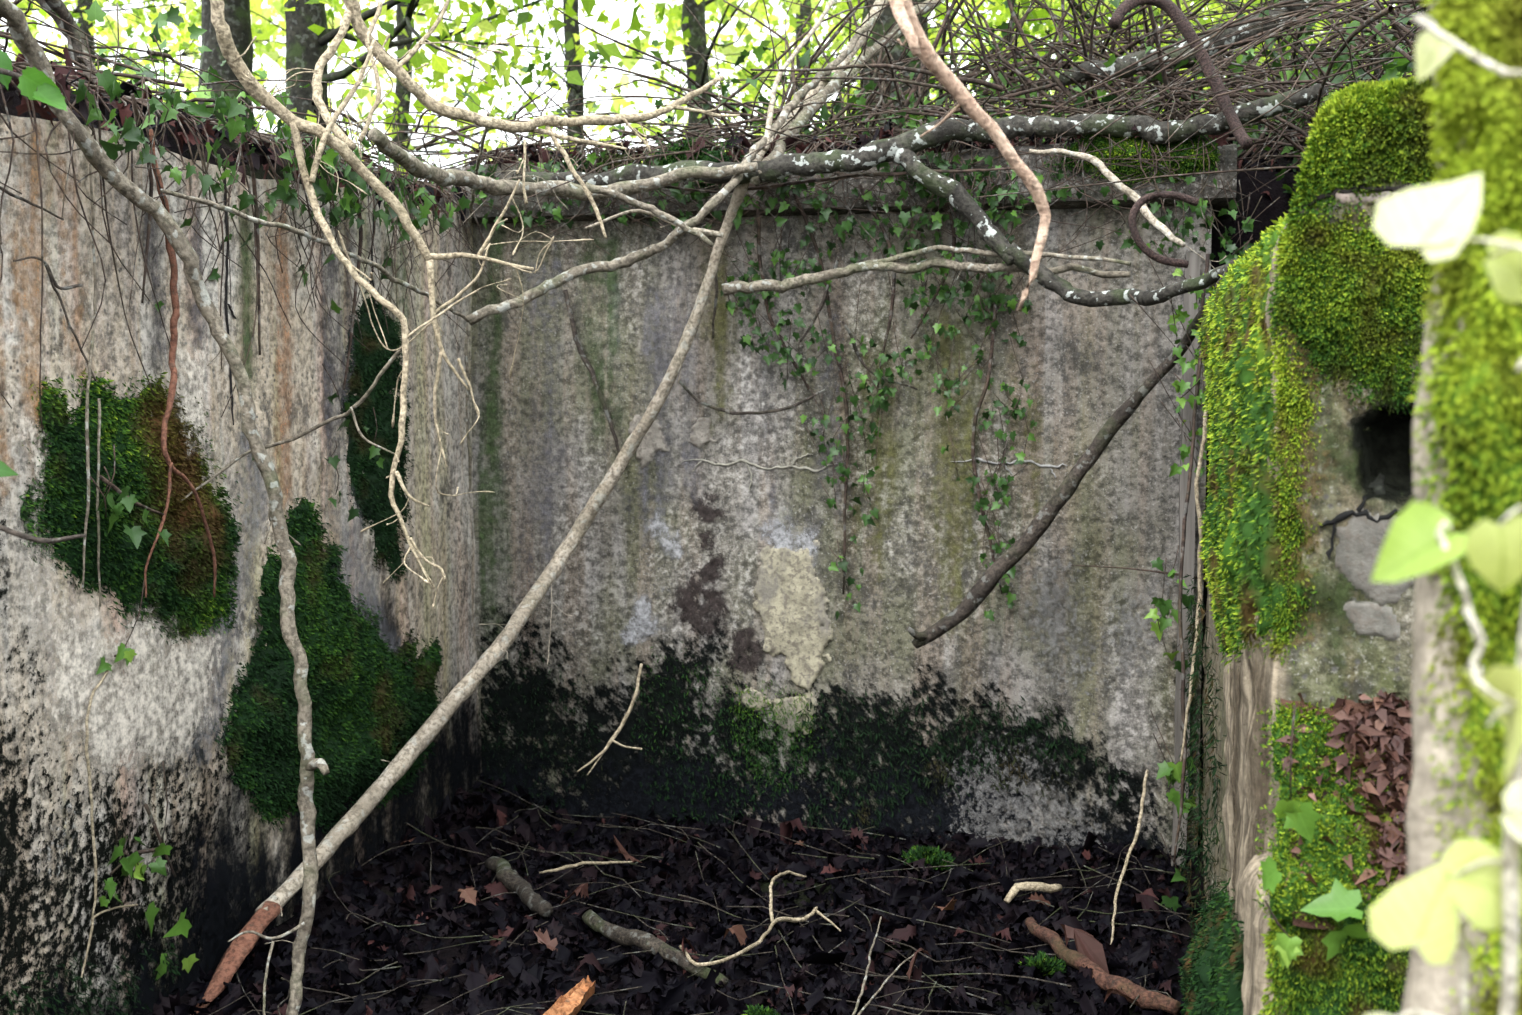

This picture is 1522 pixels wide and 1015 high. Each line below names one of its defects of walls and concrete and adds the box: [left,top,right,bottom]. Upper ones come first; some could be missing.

water stain [144,201,207,442]
water stain [21,419,43,482]
water stain [621,439,765,674]
flaking render [740,540,833,735]
water stain [762,490,817,555]
crack [1319,495,1409,560]
water stain [32,559,1195,1015]